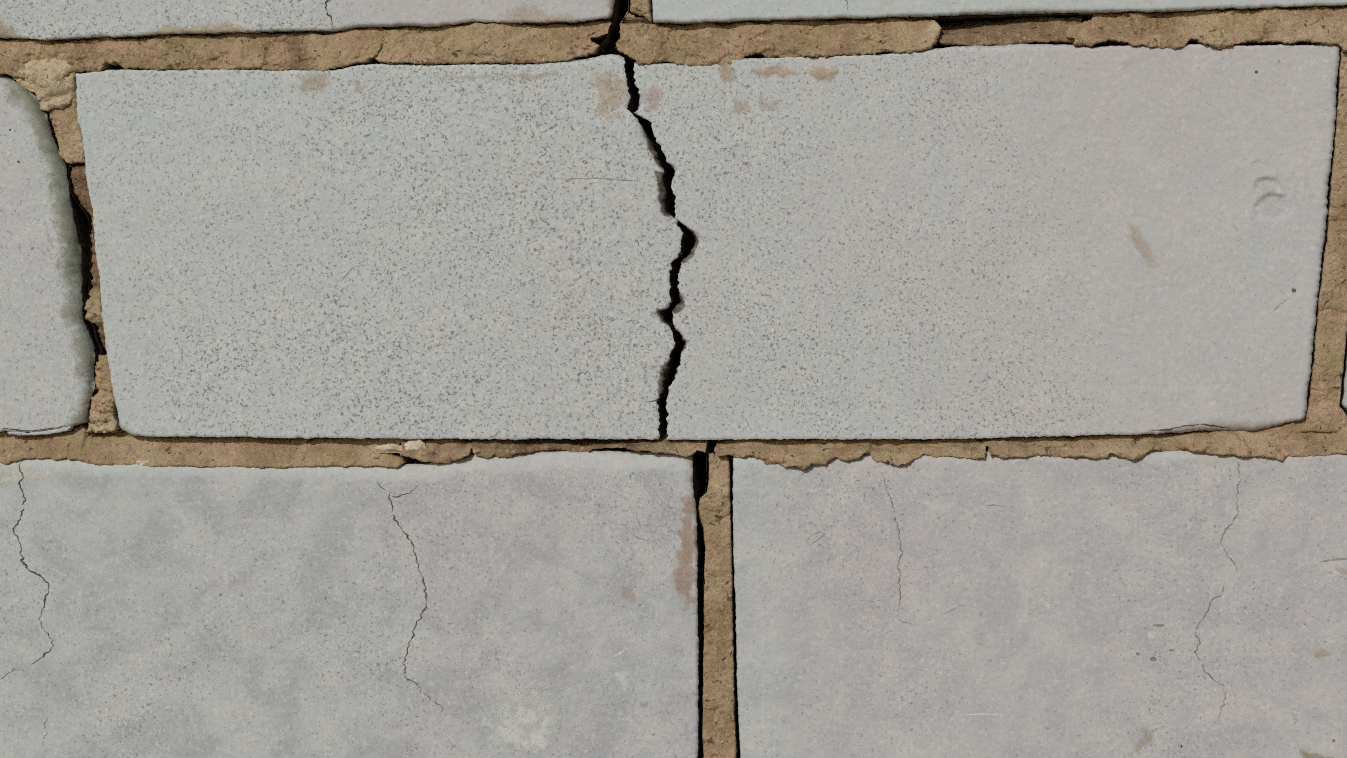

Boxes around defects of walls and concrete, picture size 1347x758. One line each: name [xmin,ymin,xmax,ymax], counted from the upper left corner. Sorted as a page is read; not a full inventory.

crack [47,114,59,149]
crack [600,0,676,218]
crack [64,44,1341,440]
crack [1339,333,1347,404]
crack [1,462,54,679]
crack [377,482,453,745]
crack [693,440,718,758]
crack [729,455,741,758]
crack [880,472,911,624]
crack [1194,461,1241,721]